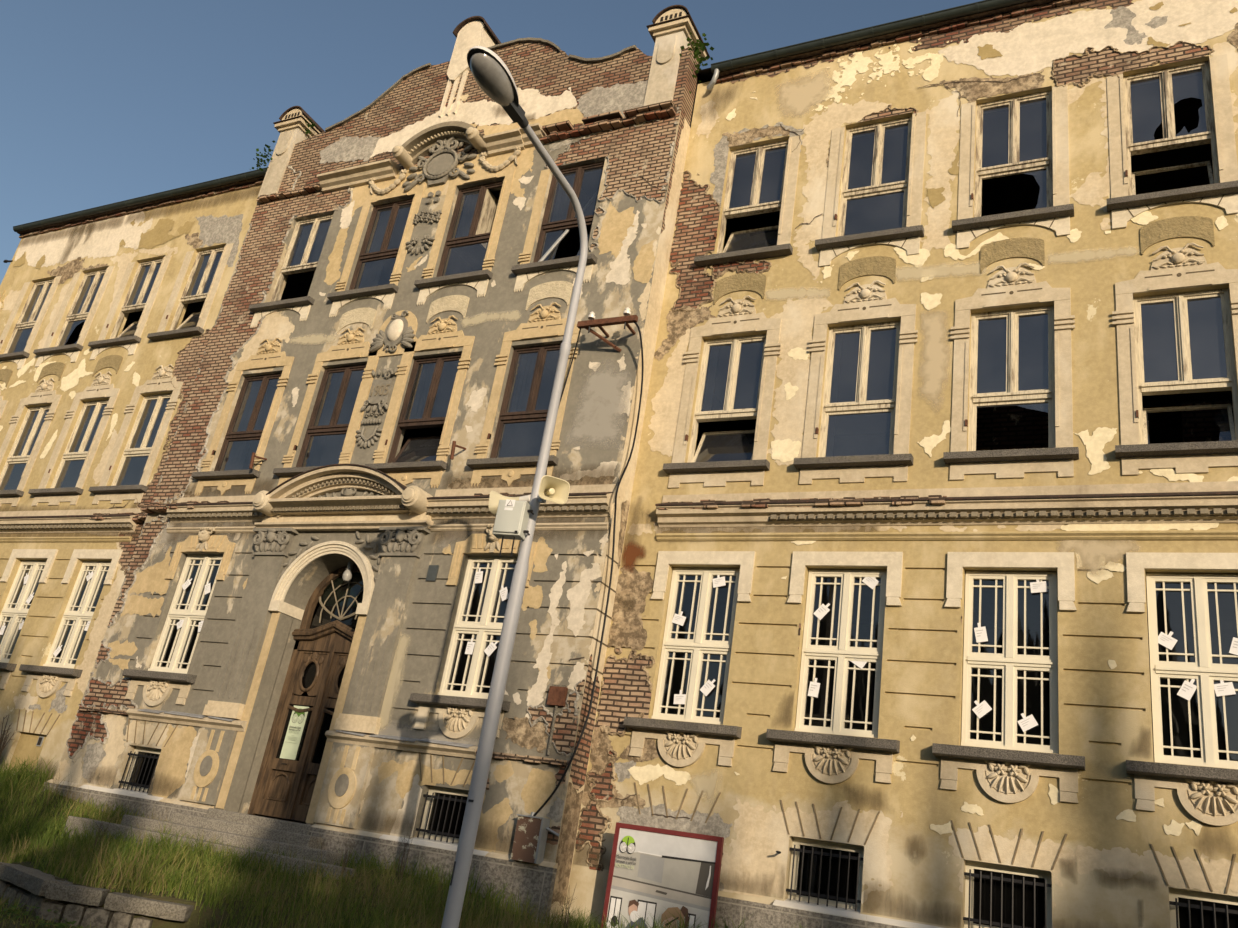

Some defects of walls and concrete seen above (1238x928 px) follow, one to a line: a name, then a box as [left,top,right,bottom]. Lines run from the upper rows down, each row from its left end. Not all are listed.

peeling [696,0,1238,466]
peeling [0,211,203,390]
flaking render [54,87,772,798]
peeling [1073,427,1117,475]
peeling [1139,468,1204,482]
peeling [997,523,1219,531]
peeling [1075,552,1127,584]
flaking render [474,500,907,905]
peeling [359,760,473,838]
peeling [1048,784,1060,805]
flaking render [930,802,1238,894]